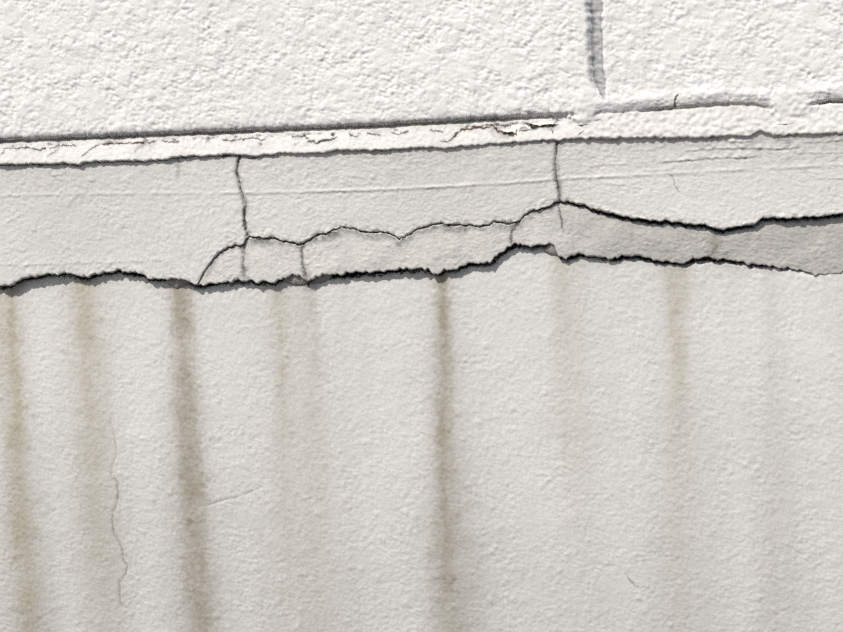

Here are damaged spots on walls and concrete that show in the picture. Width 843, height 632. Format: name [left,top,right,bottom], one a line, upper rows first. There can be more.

crack [292,131,408,151]
crack [0,138,843,290]
crack [431,126,489,142]
peeling [198,201,843,286]
damp [142,278,387,632]
damp [398,265,520,632]
damp [534,249,607,632]